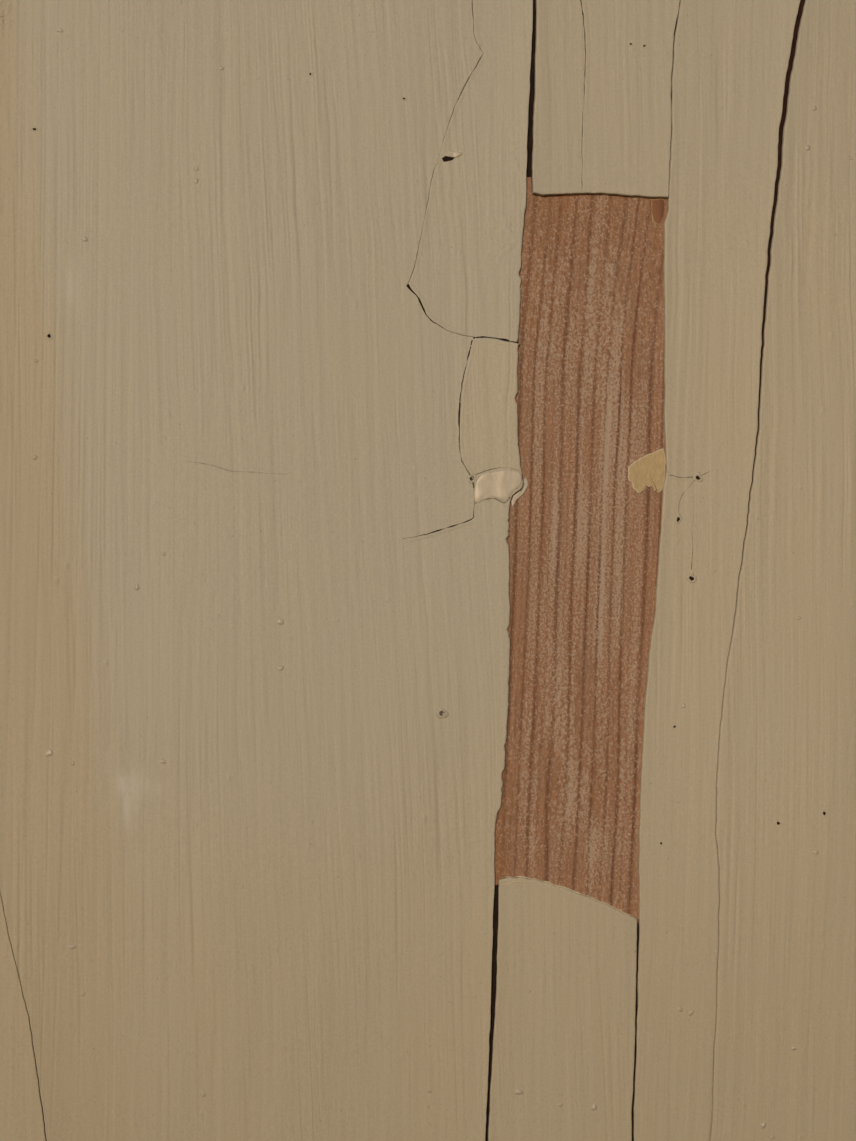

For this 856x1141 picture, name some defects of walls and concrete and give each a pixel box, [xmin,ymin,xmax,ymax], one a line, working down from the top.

crack [526,0,536,183]
crack [580,0,590,191]
crack [402,0,522,543]
crack [732,0,805,632]
peeling [495,177,668,924]
crack [485,885,498,1141]
crack [631,919,639,1141]